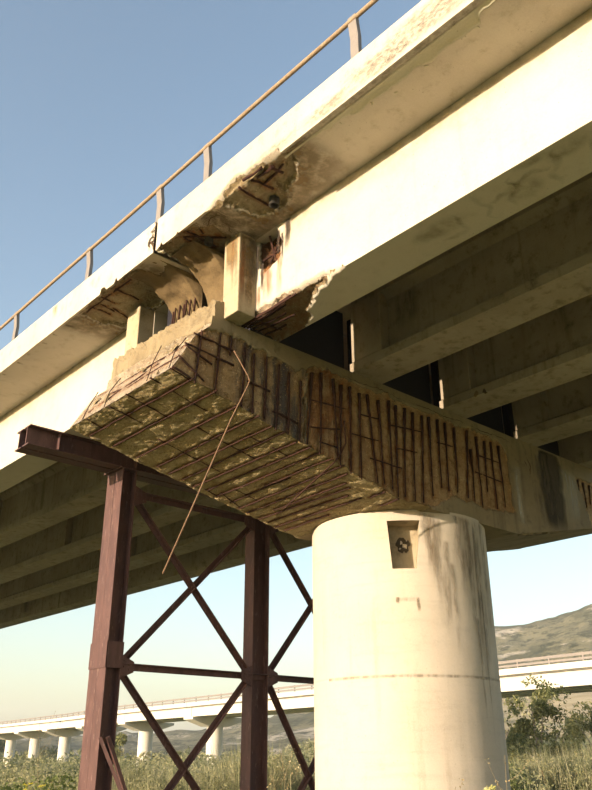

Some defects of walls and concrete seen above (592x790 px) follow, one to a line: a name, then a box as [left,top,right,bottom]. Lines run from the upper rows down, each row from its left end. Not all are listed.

spalling [210,149,298,215]
spalling [82,269,162,327]
spalling [171,298,196,324]
spalling [241,264,343,342]
spalling [71,323,515,537]
water stain [535,451,566,524]
water stain [422,517,457,611]